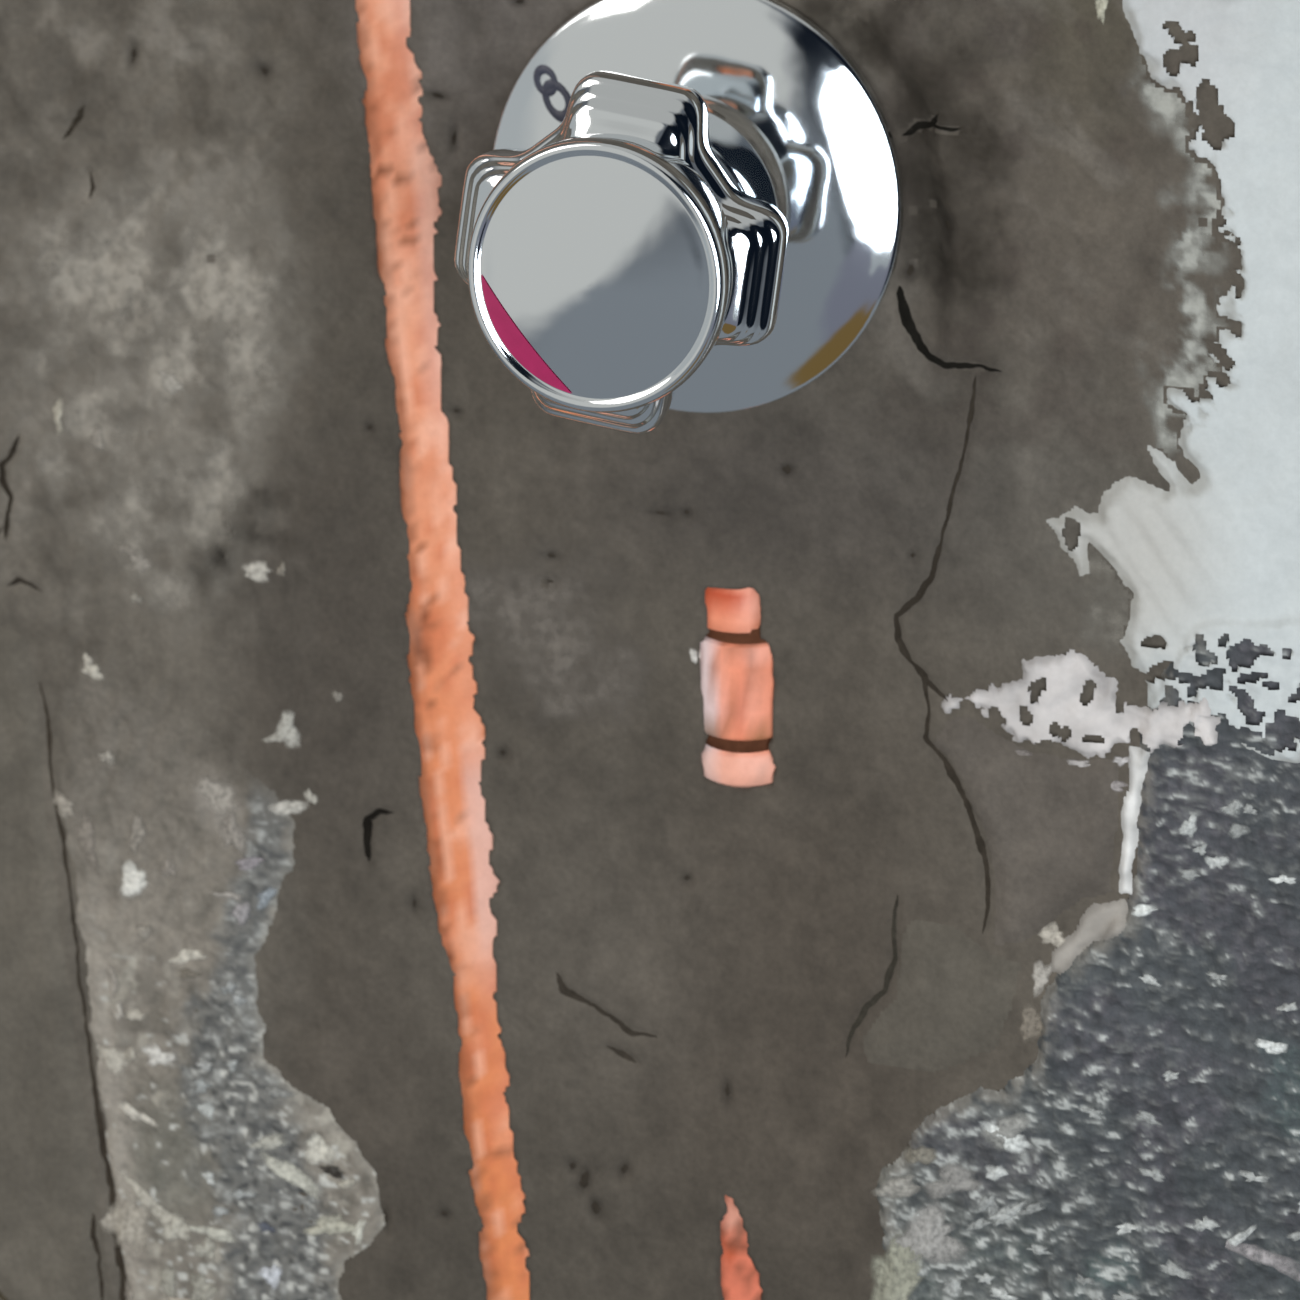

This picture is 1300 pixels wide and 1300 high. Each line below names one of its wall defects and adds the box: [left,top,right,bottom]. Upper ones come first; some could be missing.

crack [902,114,962,136]
crack [0,435,19,540]
crack [39,682,128,1300]
peeling [54,630,388,1300]
crack [363,808,394,862]
crack [556,973,657,1063]
crack [894,286,1002,934]
spalling [873,633,1300,1300]